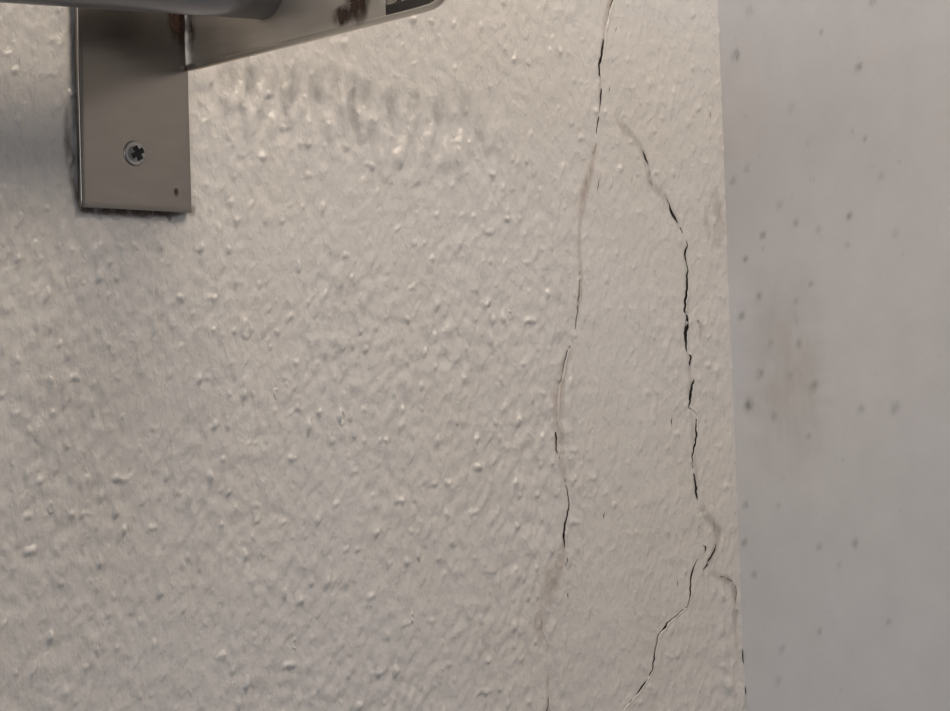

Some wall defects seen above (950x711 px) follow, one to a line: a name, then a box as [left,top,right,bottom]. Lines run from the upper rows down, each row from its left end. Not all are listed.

crack [595,0,616,148]
crack [555,280,580,458]
crack [643,152,699,499]
crack [562,485,570,566]
crack [623,523,737,711]